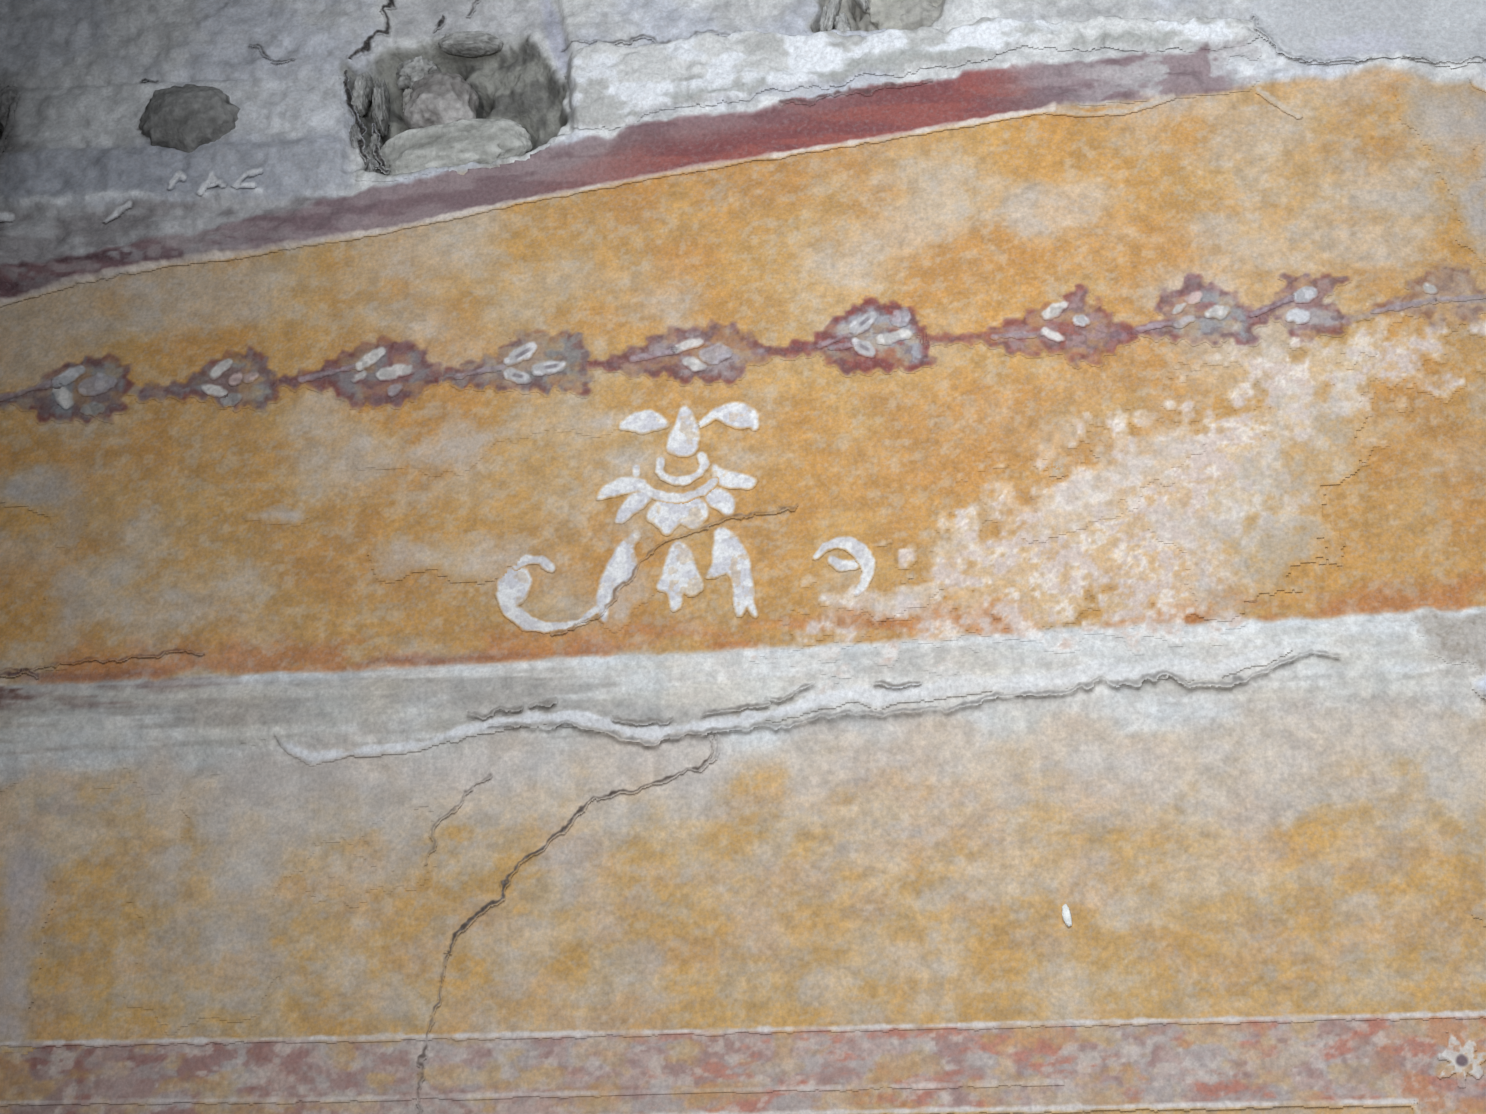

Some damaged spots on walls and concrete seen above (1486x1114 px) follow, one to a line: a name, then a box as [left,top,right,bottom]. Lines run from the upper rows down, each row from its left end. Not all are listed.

crack [343,0,398,174]
crack [433,0,480,32]
spalling [1408,605,1486,675]
crack [416,648,1341,1114]